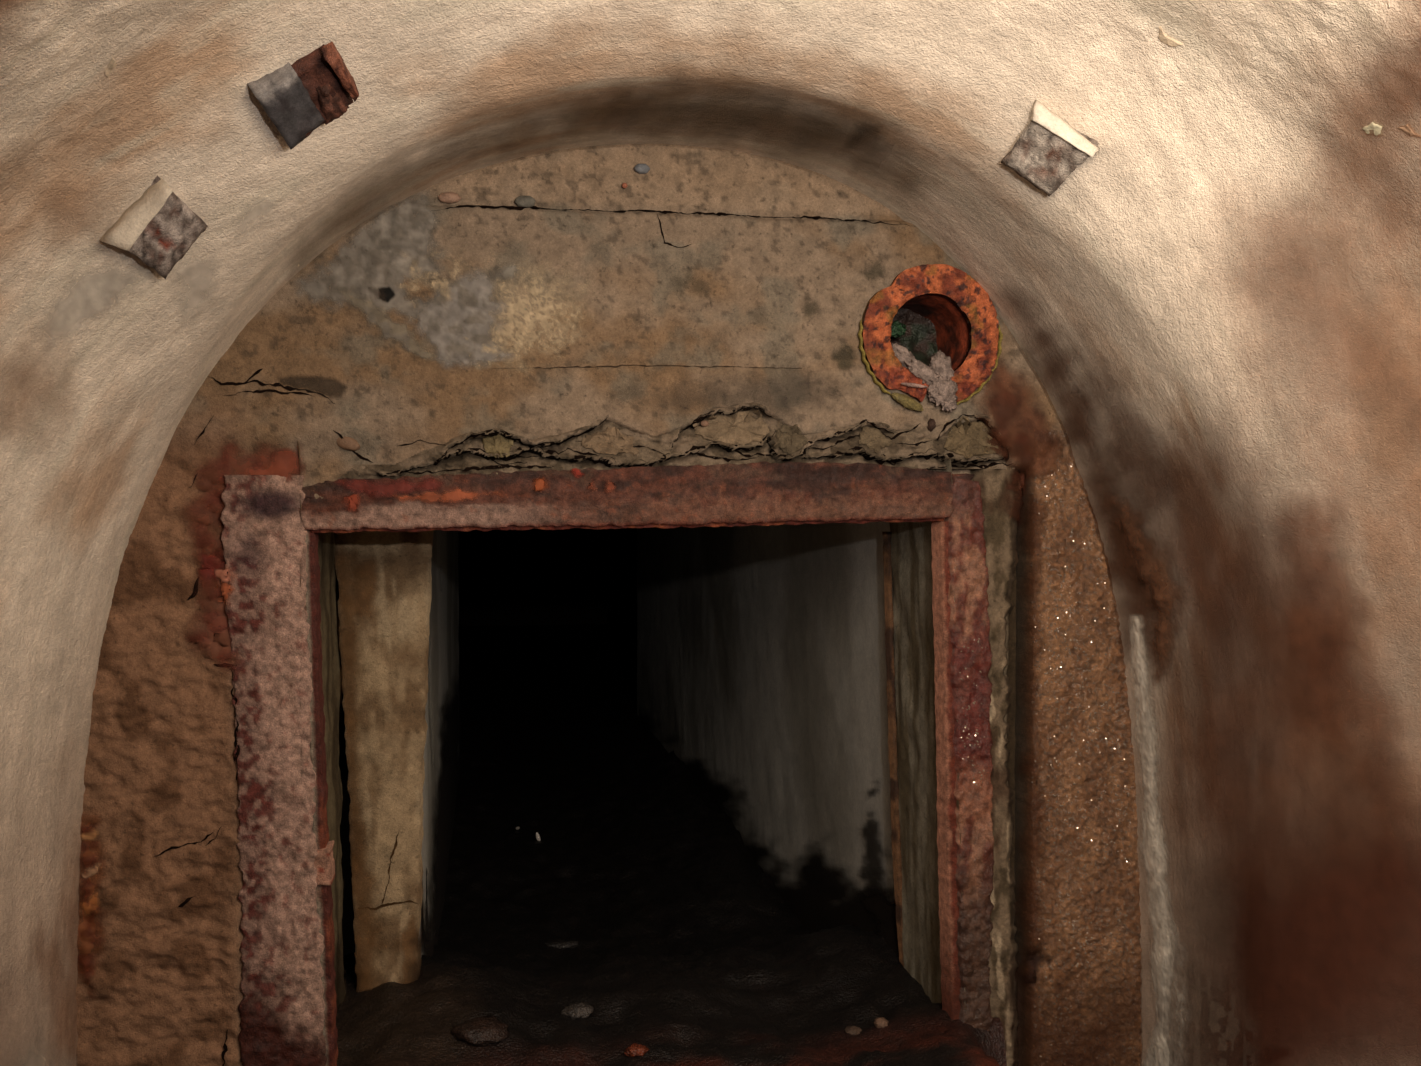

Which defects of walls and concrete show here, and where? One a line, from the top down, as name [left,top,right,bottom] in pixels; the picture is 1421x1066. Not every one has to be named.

crack [432,205,910,248]
crack [494,363,802,371]
crack [187,577,199,600]
corrosion [186,445,303,665]
corrosion [335,479,479,512]
corrosion [535,478,546,491]
crack [189,369,1013,488]
corrosion [337,554,376,772]
damp [1038,333,1175,1066]
damp [1161,467,1421,1066]
corrosion [352,841,376,991]